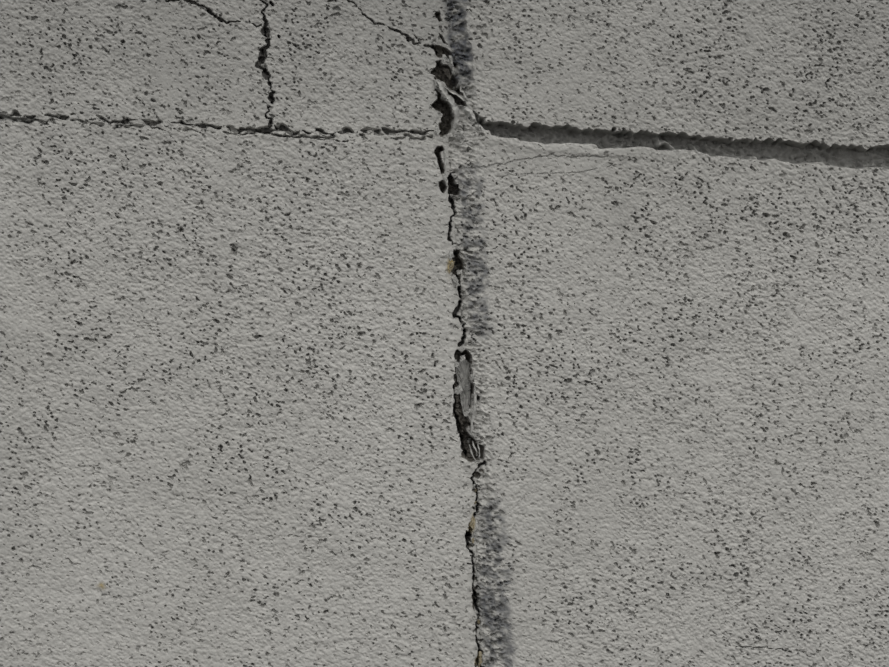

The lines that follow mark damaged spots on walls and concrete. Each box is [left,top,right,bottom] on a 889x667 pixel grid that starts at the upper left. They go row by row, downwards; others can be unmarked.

crack [12,112,73,124]
crack [100,0,437,142]
crack [465,461,485,667]